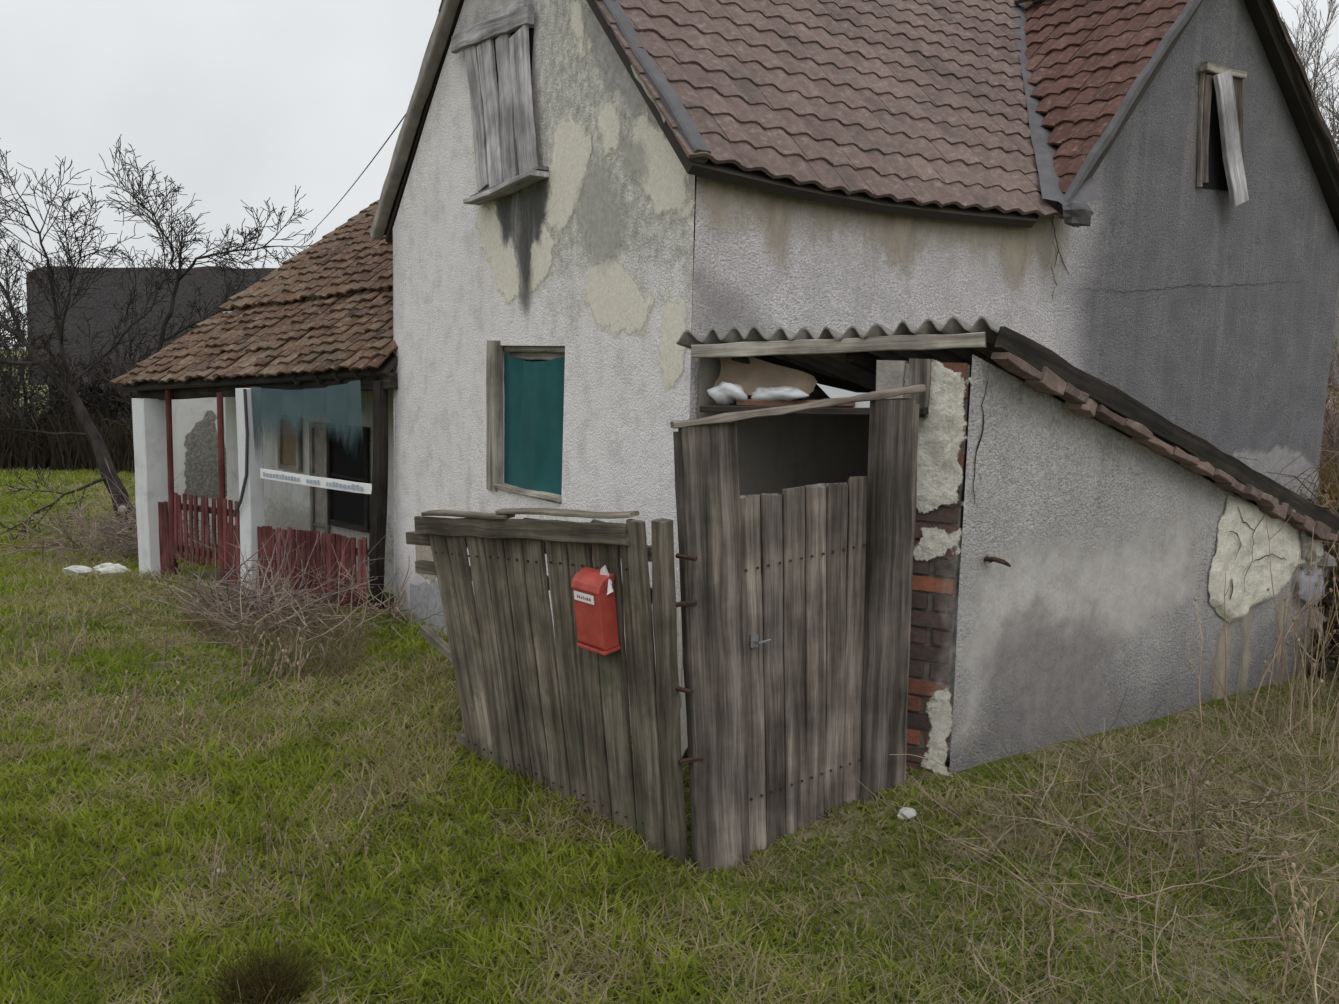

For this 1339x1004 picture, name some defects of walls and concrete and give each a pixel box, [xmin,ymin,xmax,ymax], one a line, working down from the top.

peeling [476,0,694,303]
leakage [496,181,548,307]
peeling [584,256,688,389]
peeling [184,410,227,500]
crack [973,380,988,503]
spalling [906,359,974,776]